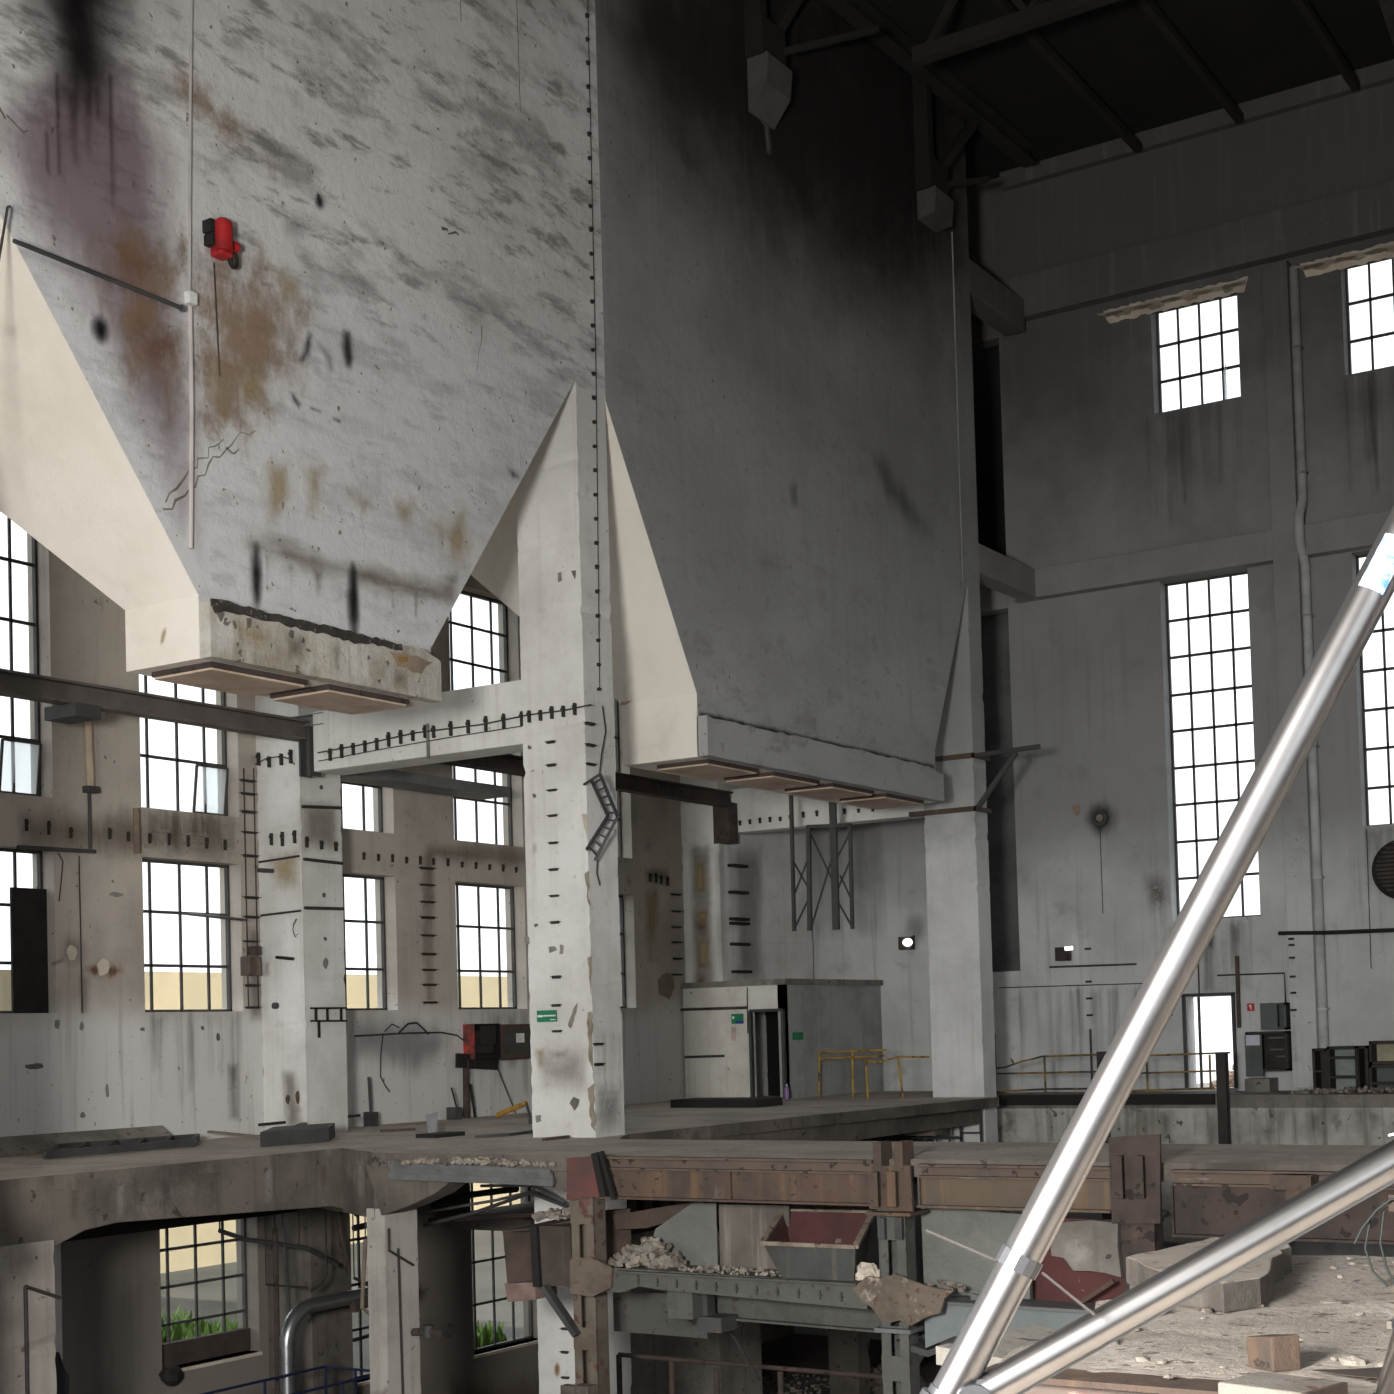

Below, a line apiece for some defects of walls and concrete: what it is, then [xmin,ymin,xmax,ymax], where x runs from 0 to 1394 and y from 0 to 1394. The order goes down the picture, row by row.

corrosion [204,265,281,417]
crack [163,430,256,510]
spalling [210,598,432,674]